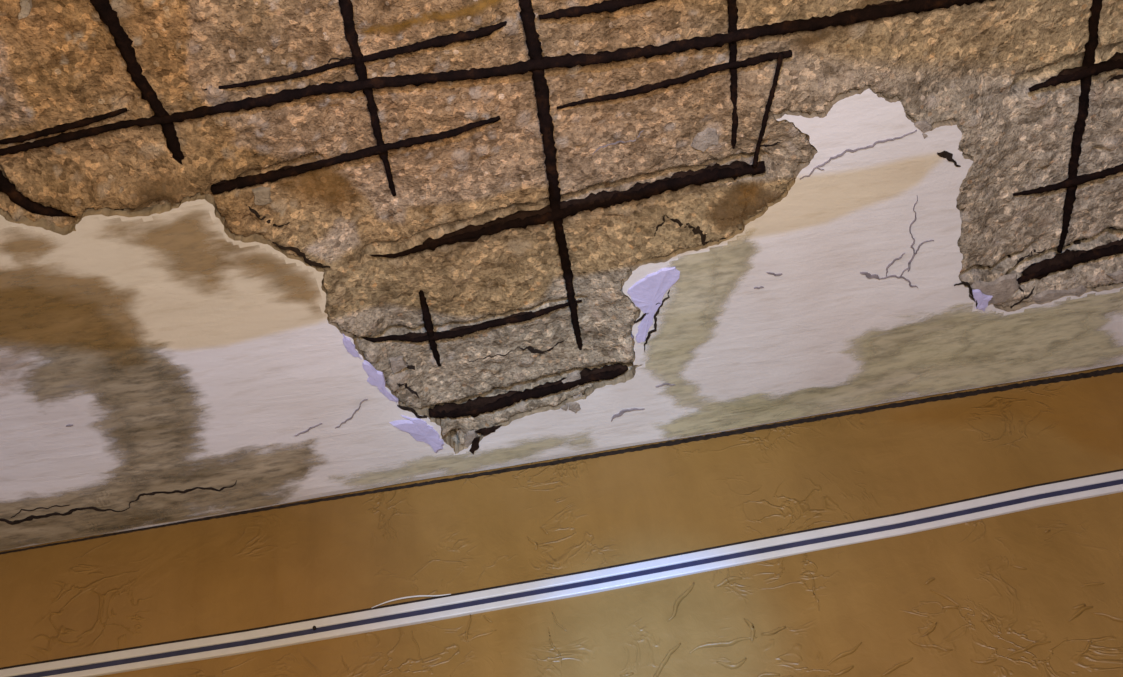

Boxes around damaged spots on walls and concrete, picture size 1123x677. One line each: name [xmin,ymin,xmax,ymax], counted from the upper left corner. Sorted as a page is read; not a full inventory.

rust [364,0,500,33]
damp [1,239,51,253]
rust [136,182,179,212]
damp [139,216,317,301]
spalling [0,0,1123,455]
rust [710,185,776,229]
crack [860,196,934,288]
crack [468,341,564,362]
damp [955,312,1090,362]
damp [0,267,308,524]
damp [786,368,928,406]
crack [0,363,1123,554]